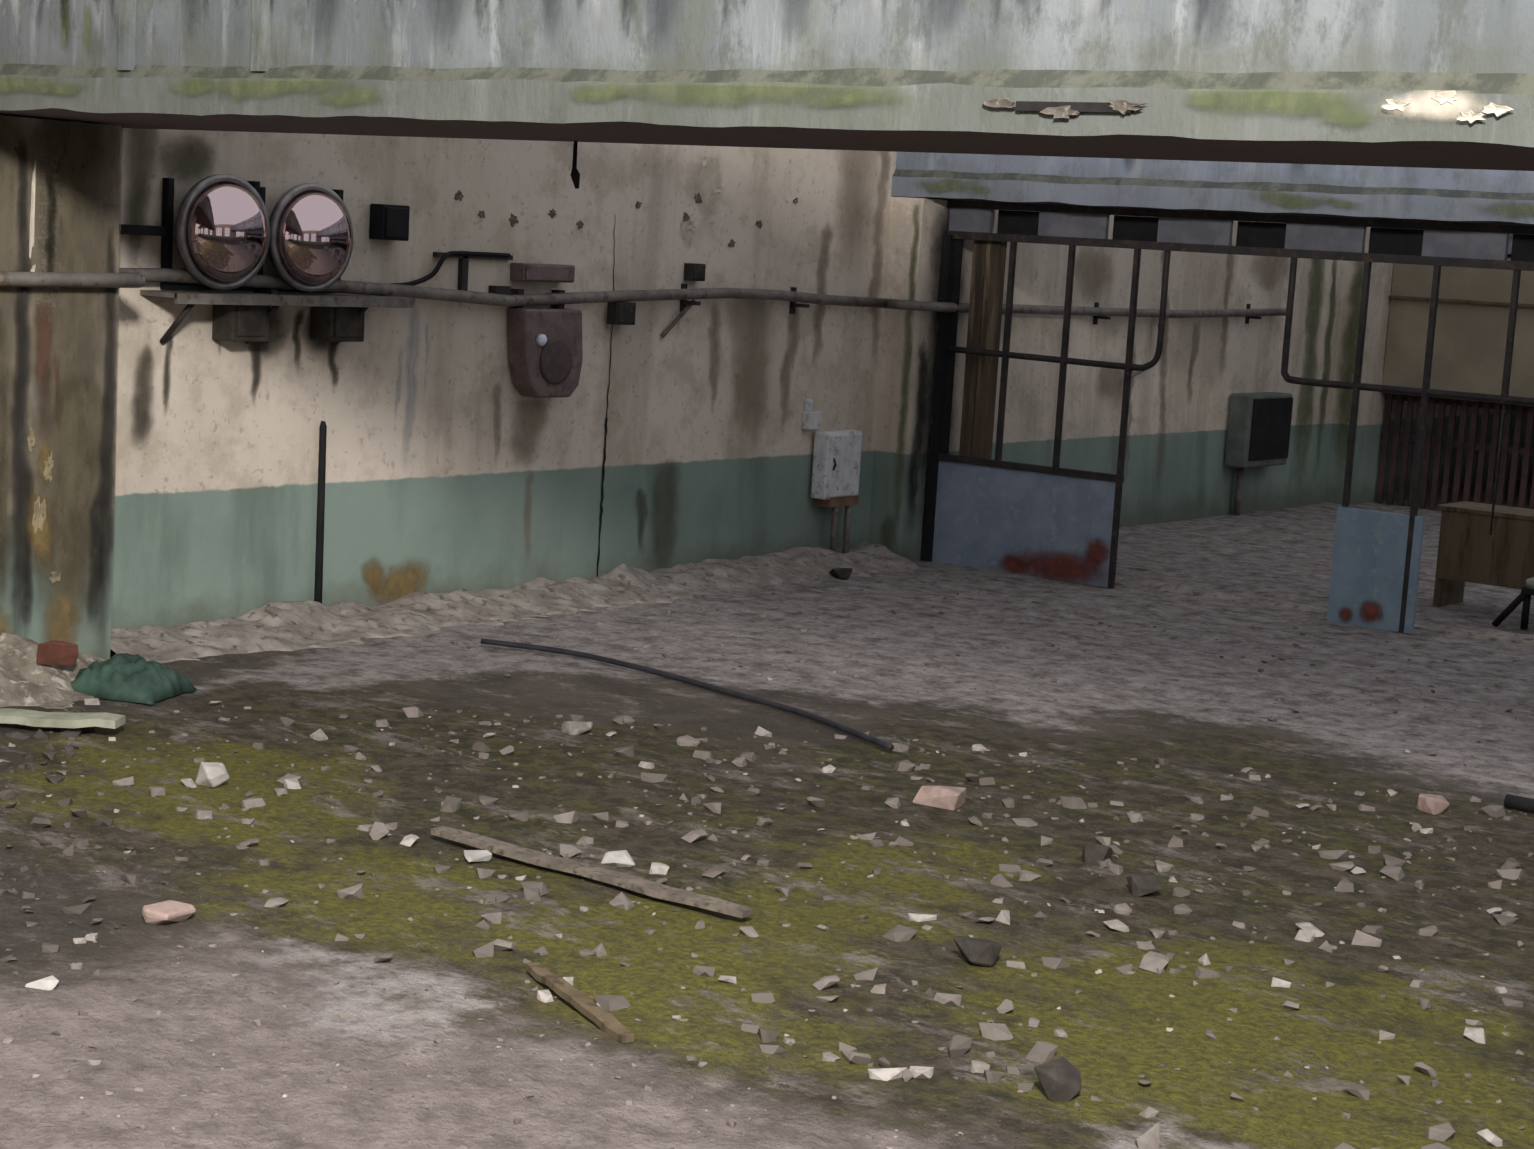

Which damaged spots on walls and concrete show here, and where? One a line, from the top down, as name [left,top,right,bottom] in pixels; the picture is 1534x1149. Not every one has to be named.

peeling [1381,91,1514,124]
damp [848,150,888,297]
damp [0,115,210,613]
damp [910,348,927,510]
damp [1319,263,1336,446]